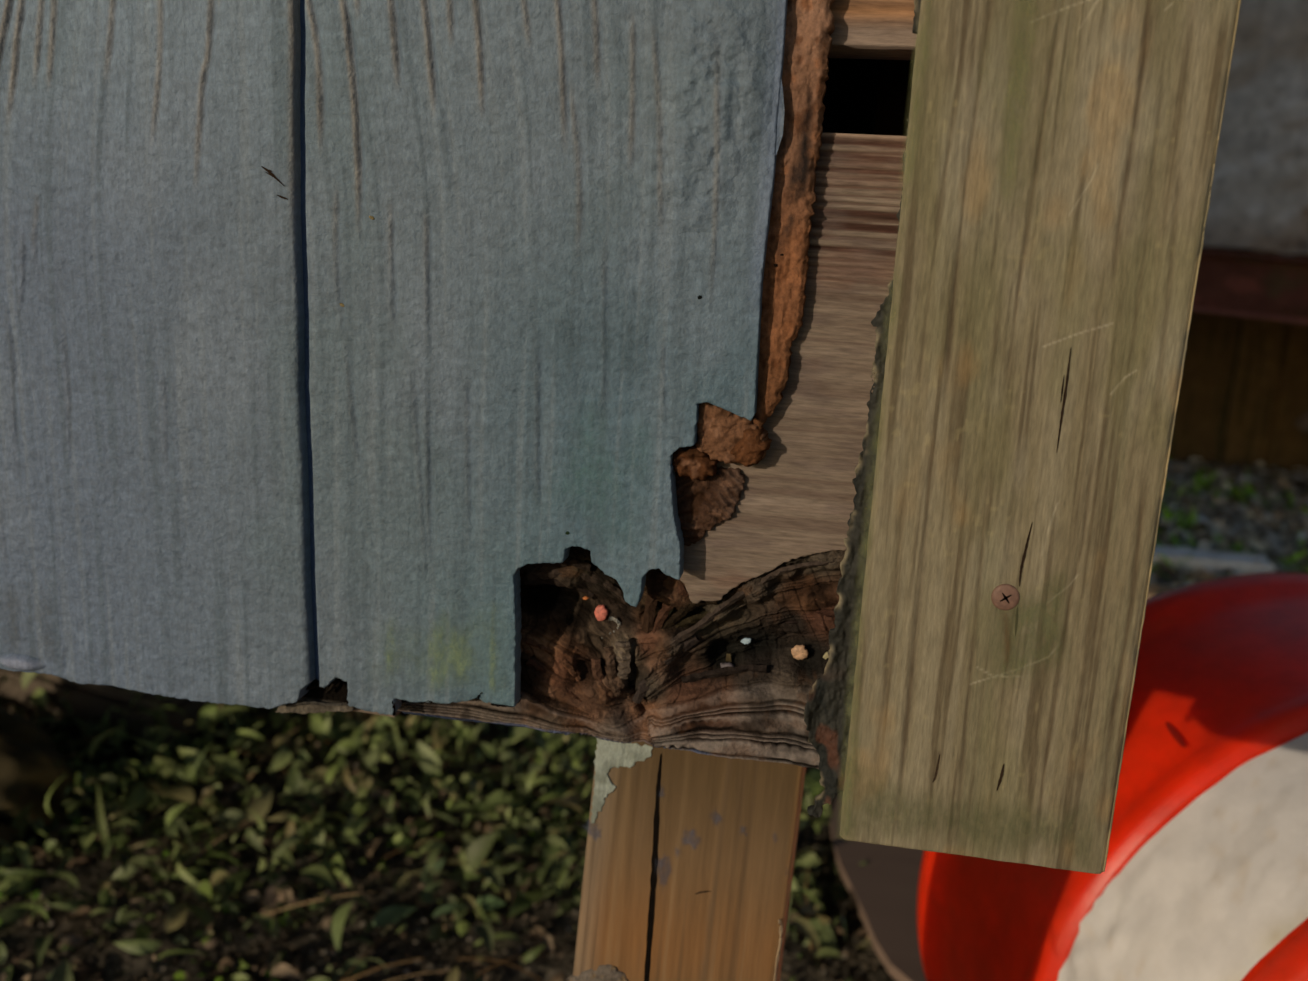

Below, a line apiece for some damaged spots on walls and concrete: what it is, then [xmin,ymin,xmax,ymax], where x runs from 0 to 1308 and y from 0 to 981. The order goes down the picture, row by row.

peeling [672,0,835,546]
crack [1056,348,1071,453]
crack [644,754,662,981]